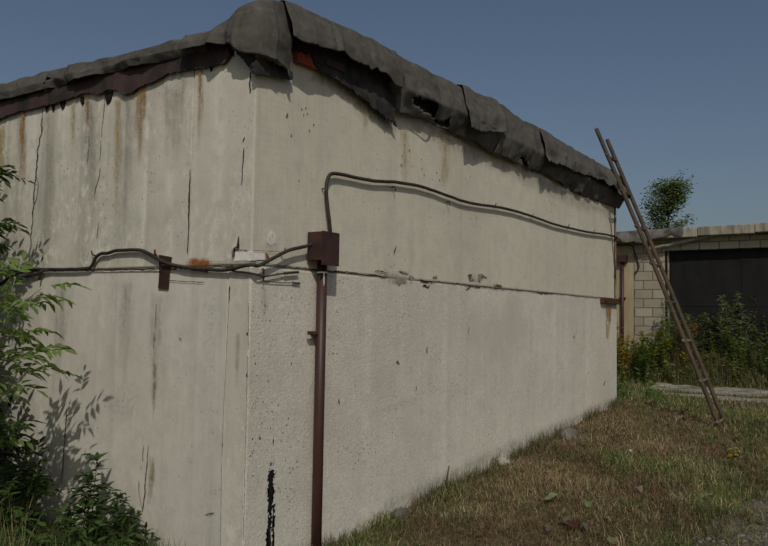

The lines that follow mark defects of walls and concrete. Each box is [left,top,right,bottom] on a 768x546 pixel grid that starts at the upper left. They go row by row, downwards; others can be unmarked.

crack [14,108,63,272]
crack [87,173,249,412]
peeling [233,250,251,261]
spalling [385,270,414,286]
crack [60,409,68,482]